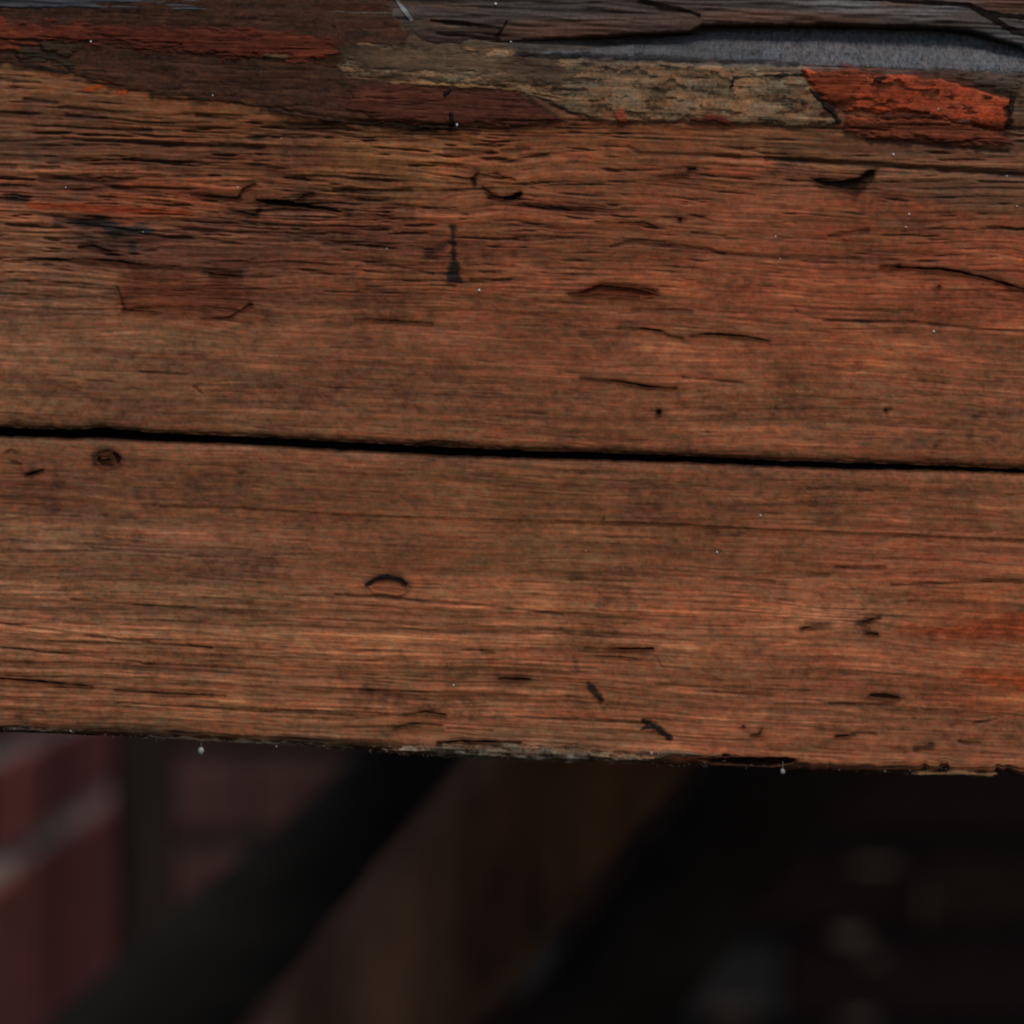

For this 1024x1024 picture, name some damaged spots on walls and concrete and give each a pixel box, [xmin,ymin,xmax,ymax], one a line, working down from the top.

peeling [0,0,842,131]
crack [0,419,1024,475]